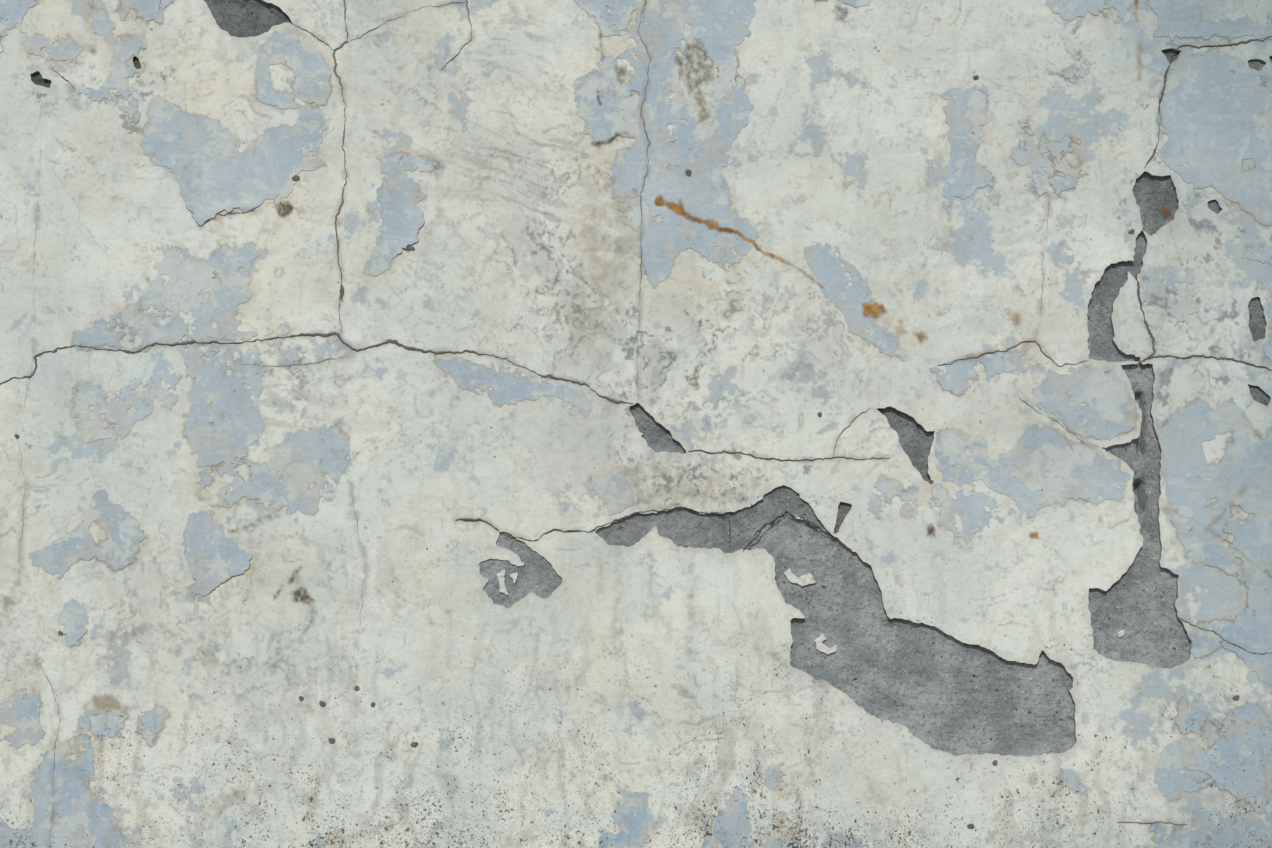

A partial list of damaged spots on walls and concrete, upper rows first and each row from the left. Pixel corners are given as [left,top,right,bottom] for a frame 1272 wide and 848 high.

flaking render [31,71,51,88]
peeling [78,0,331,226]
crack [1145,36,1272,167]
corrosion [655,196,789,264]
crack [0,0,651,580]
peeling [868,49,1272,685]
crack [1136,277,1271,370]
flaking render [629,403,686,454]
crack [691,412,880,461]
flaking render [479,532,562,608]
crack [456,507,832,549]
flaking render [585,471,1075,756]